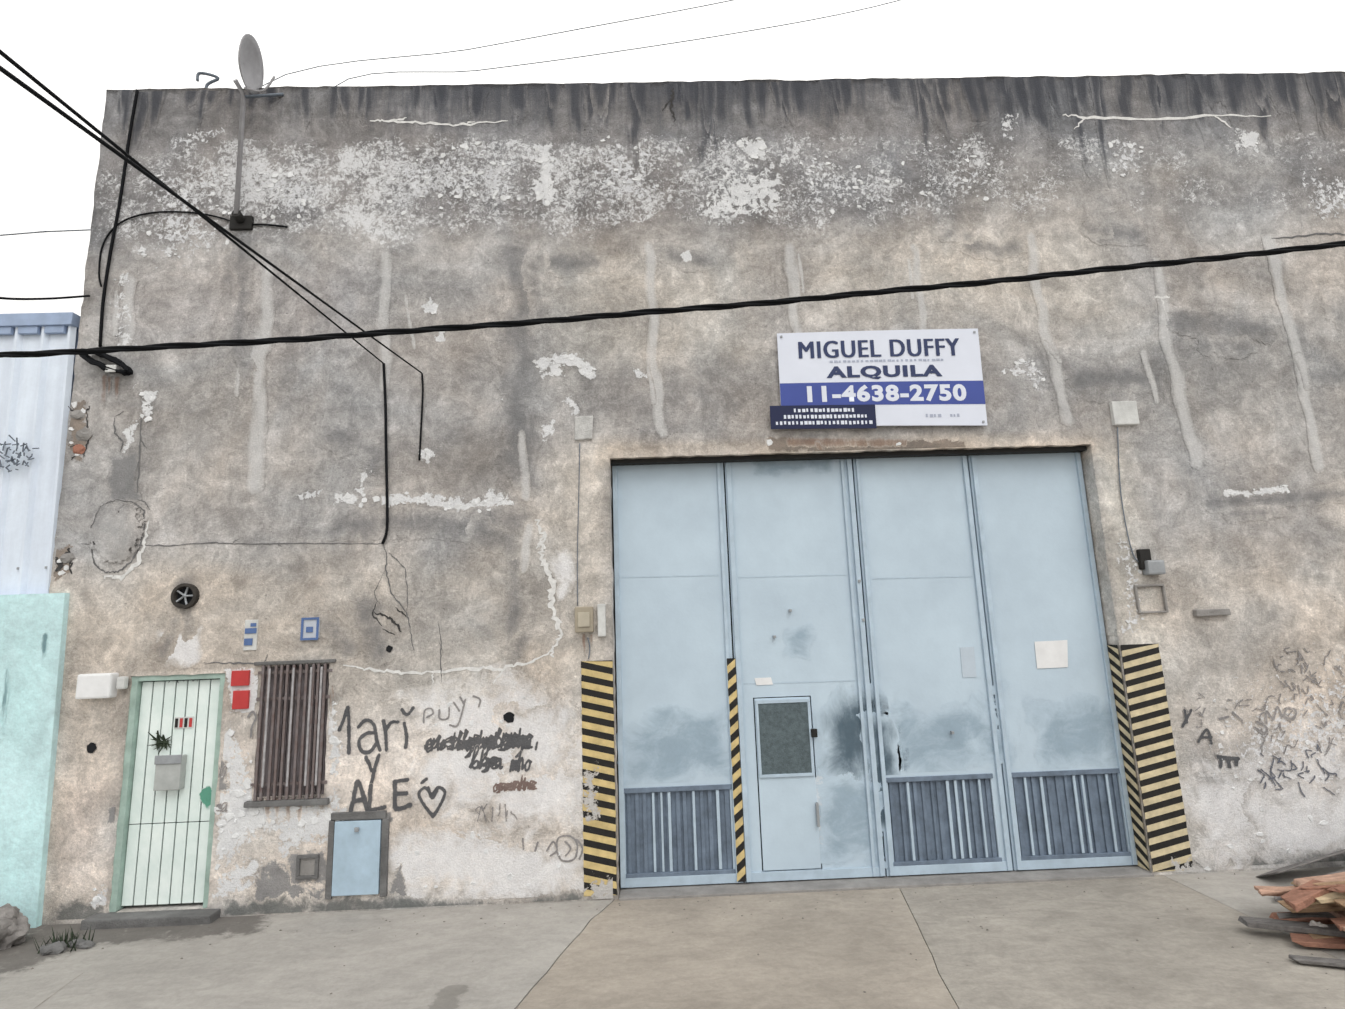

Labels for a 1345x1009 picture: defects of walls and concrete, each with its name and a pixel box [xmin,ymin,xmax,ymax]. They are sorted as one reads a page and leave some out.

damp [116,90,166,156]
damp [183,88,280,125]
damp [300,87,373,129]
damp [413,85,490,124]
damp [508,79,852,173]
damp [907,243,928,330]
damp [938,219,1345,525]
spalling [68,395,92,462]
crack [55,406,563,684]